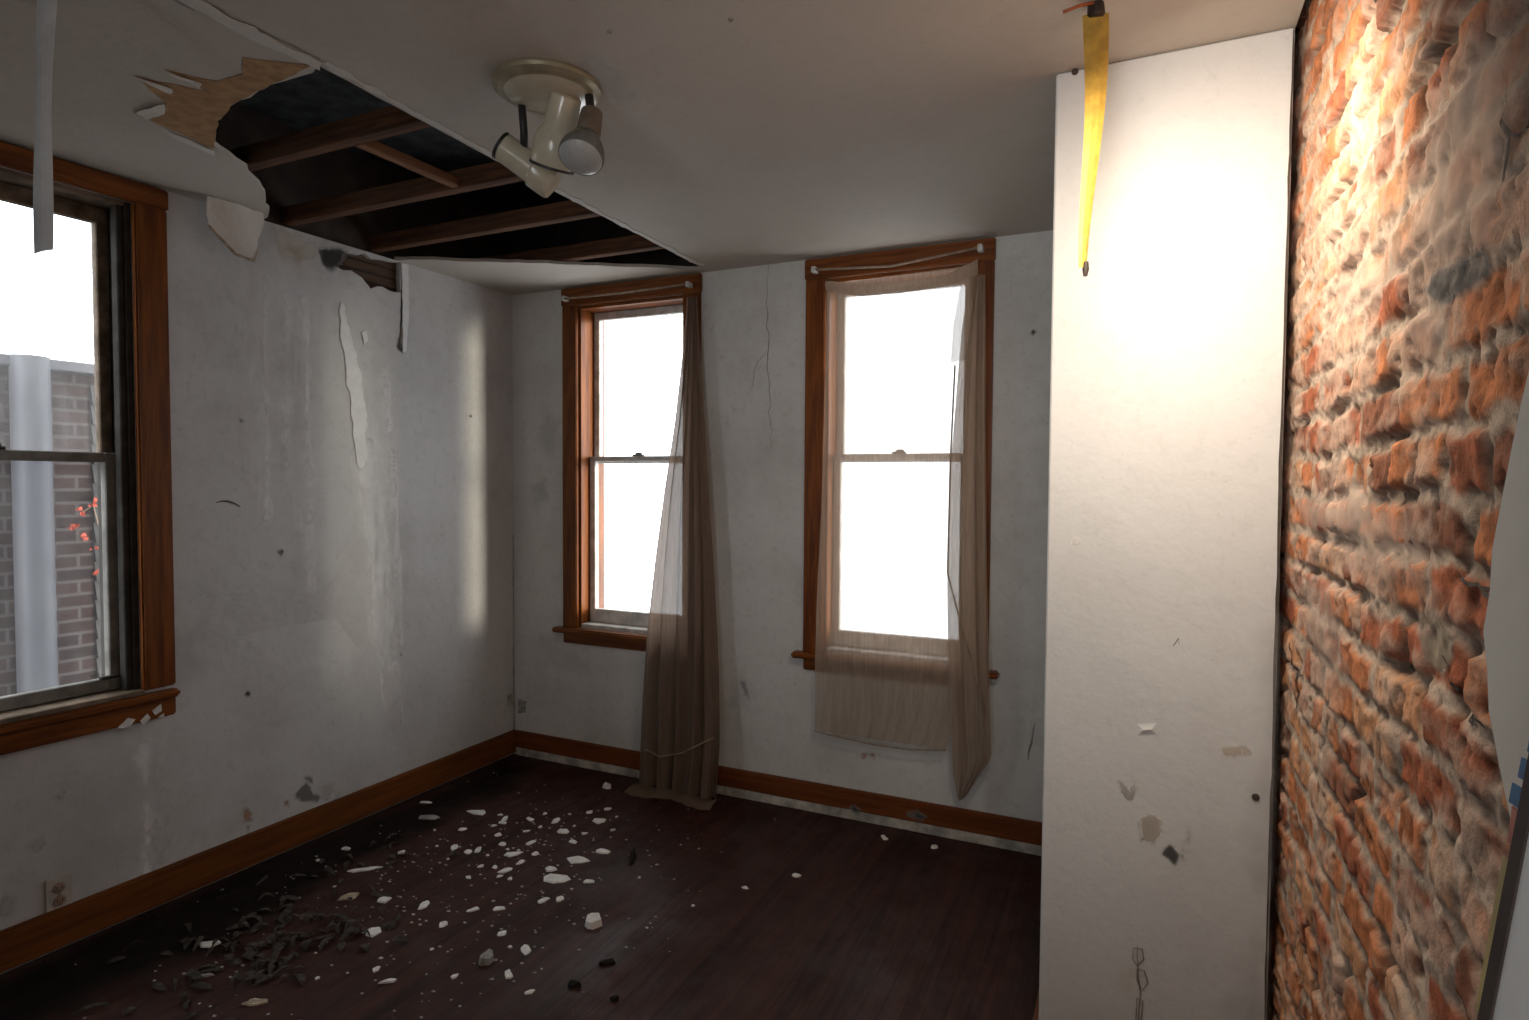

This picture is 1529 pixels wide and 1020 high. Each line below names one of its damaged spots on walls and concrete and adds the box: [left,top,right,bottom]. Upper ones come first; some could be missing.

peeling [135,72,215,156]
spalling [321,61,492,157]
peeling [206,196,264,263]
spalling [554,188,705,267]
peeling [117,704,164,728]
peeling [1138,815,1162,842]